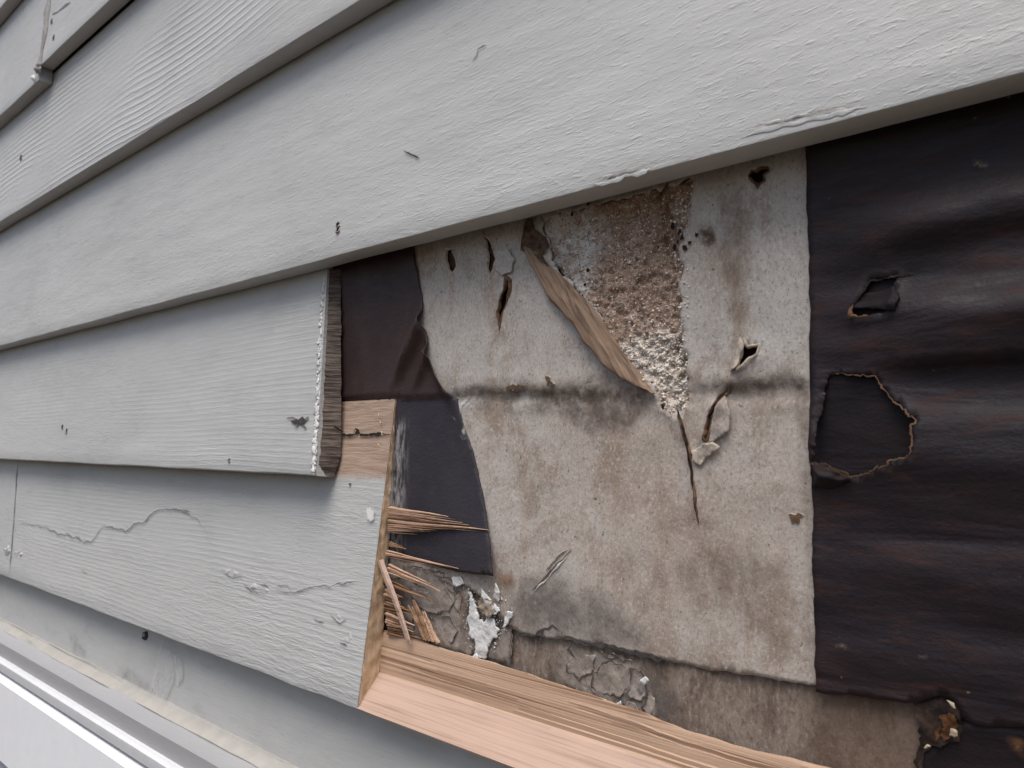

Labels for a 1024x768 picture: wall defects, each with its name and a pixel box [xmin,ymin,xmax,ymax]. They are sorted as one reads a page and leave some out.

peeling [524,246,654,393]
leakage [450,386,629,424]
leakage [702,380,769,393]
crack [9,473,212,572]
crack [514,624,673,664]